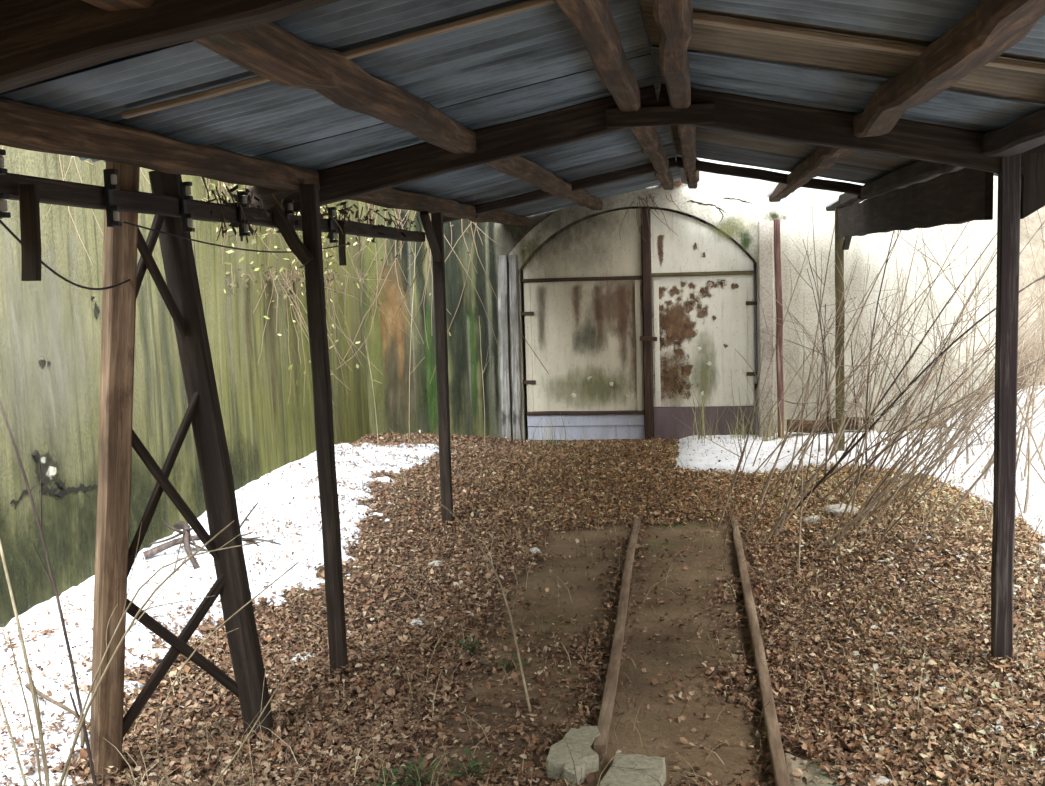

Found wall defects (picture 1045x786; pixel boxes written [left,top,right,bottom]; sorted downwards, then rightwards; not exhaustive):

damp [268,279,298,406]
rust [376,279,404,373]
damp [366,211,433,417]
damp [443,214,563,416]
rust [595,287,642,378]
rust [652,279,739,400]
damp [193,471,205,512]
damp [228,451,256,491]